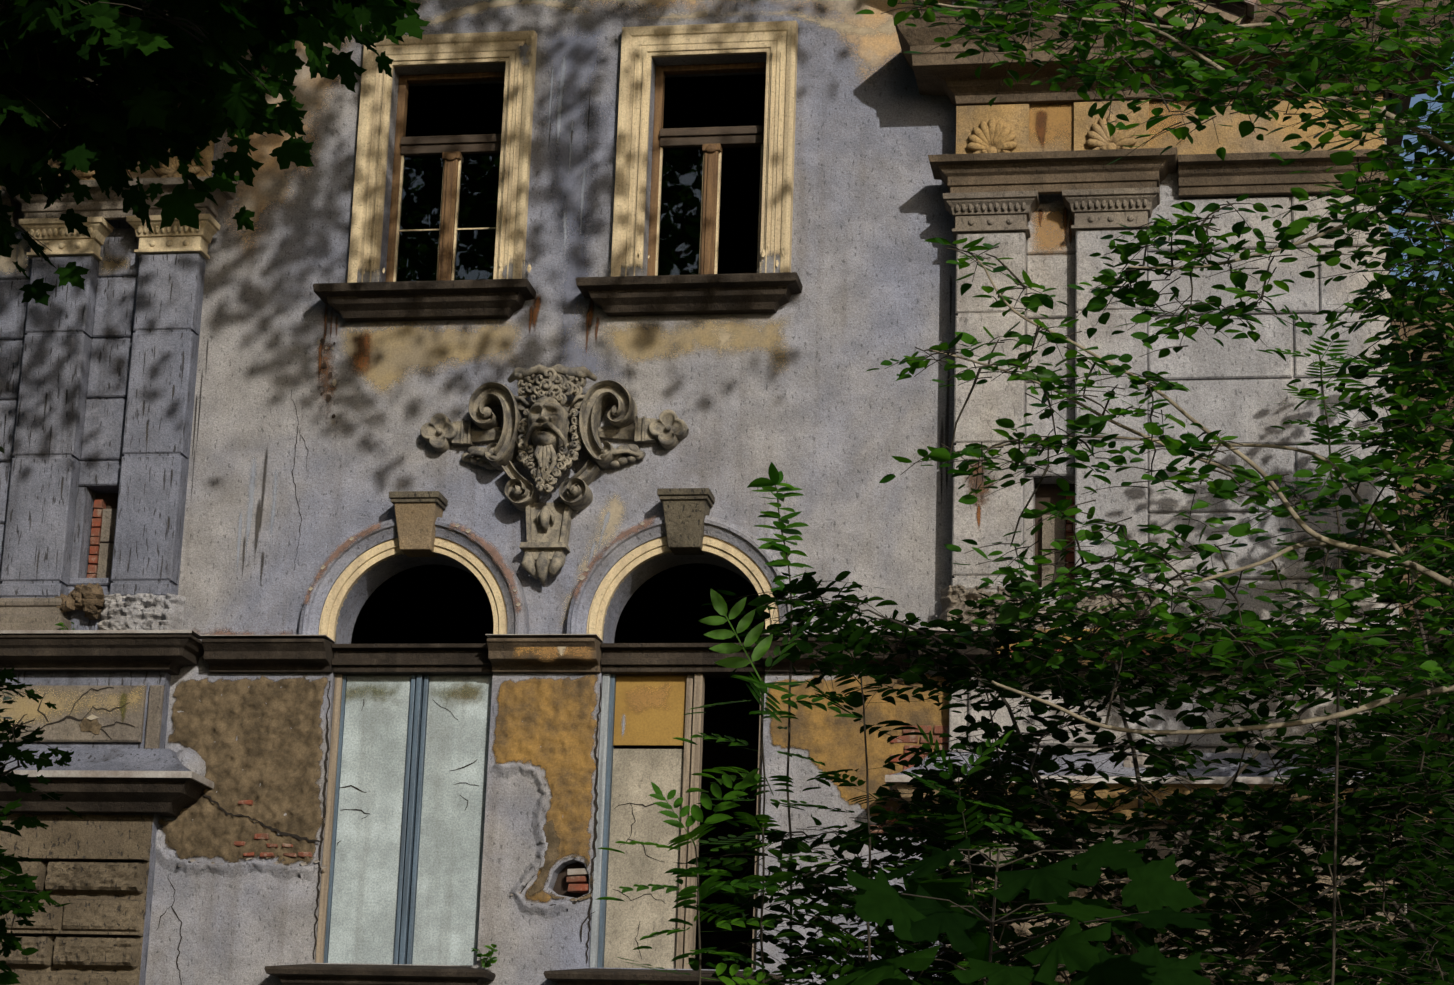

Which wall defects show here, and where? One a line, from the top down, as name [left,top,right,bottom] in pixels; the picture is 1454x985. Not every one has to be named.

corrosion [318,304,338,376]
crack [10,687,135,740]
spalling [155,674,328,881]
spalling [488,674,598,919]
spalling [767,674,950,833]